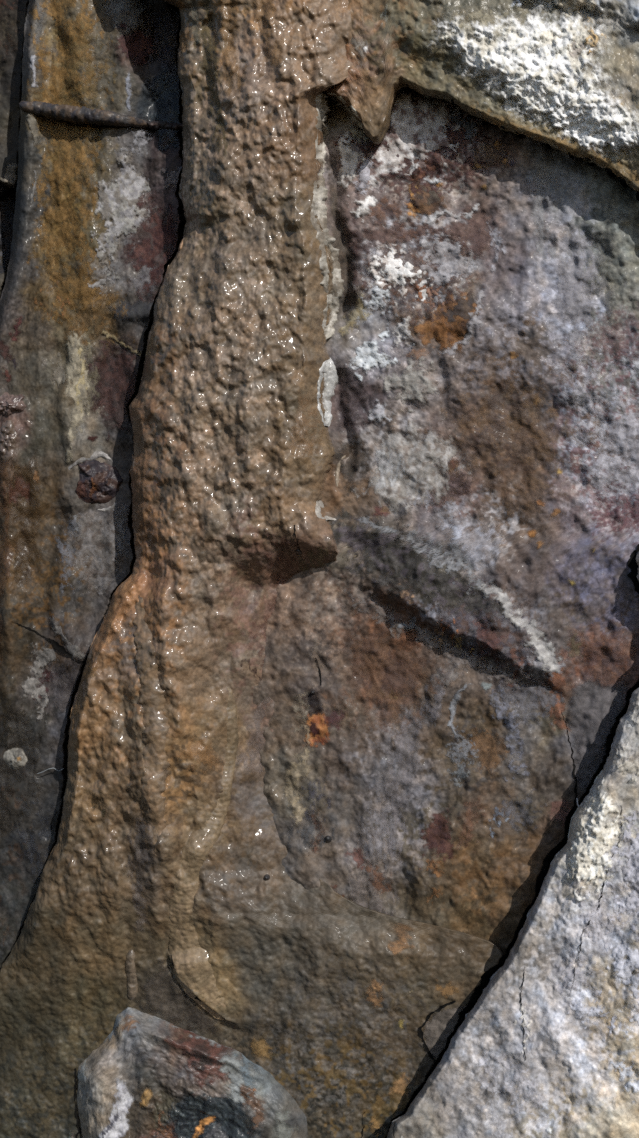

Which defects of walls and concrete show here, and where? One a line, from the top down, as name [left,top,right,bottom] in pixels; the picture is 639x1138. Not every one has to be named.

crack [101,1,186,422]
damp [89,0,241,294]
peeling [310,92,364,340]
damp [437,0,639,152]
peeling [317,358,339,426]
peeling [335,455,346,487]
corrosion [408,289,484,359]
corrosion [435,344,572,519]
crack [627,544,639,593]
damp [343,591,565,914]
crack [361,680,639,1138]
corrosion [122,1016,291,1138]